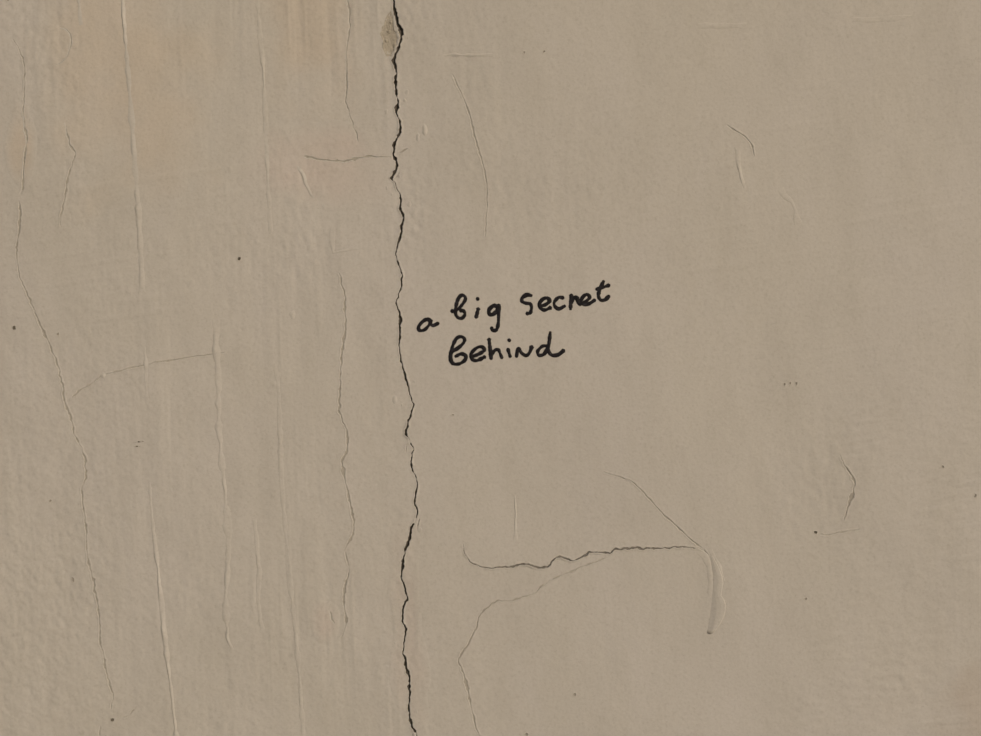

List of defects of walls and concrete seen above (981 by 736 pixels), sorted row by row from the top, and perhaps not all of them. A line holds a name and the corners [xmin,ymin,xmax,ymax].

crack [11,39,225,736]
crack [304,0,422,736]
crack [456,470,710,736]